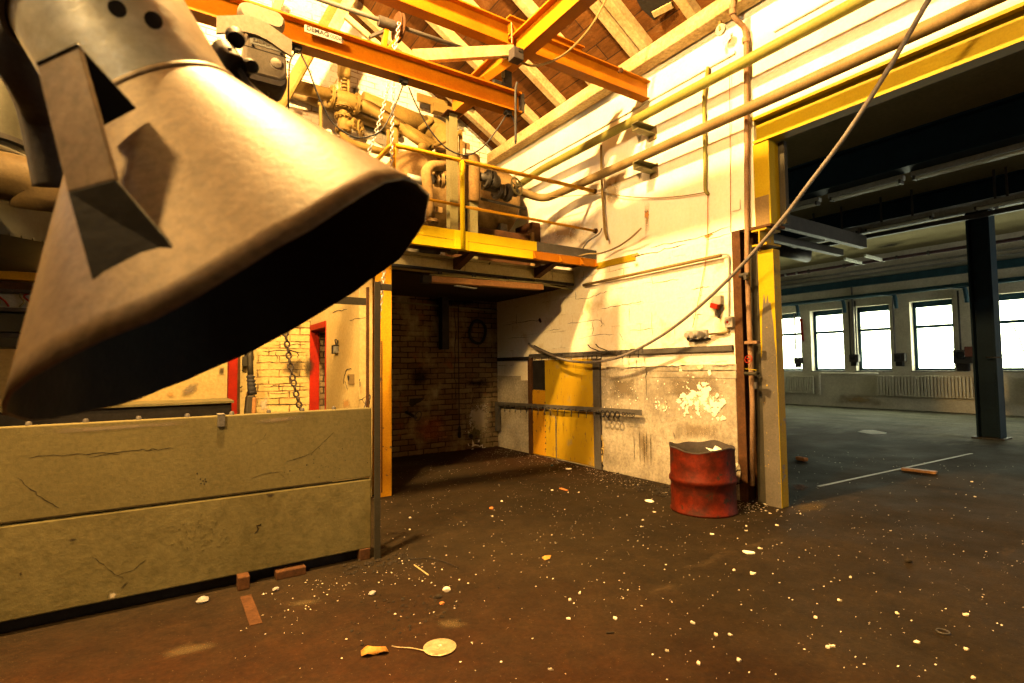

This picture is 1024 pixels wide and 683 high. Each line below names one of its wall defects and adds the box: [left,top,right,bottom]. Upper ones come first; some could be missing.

peeling [655,370,726,421]
crack [31,448,167,458]